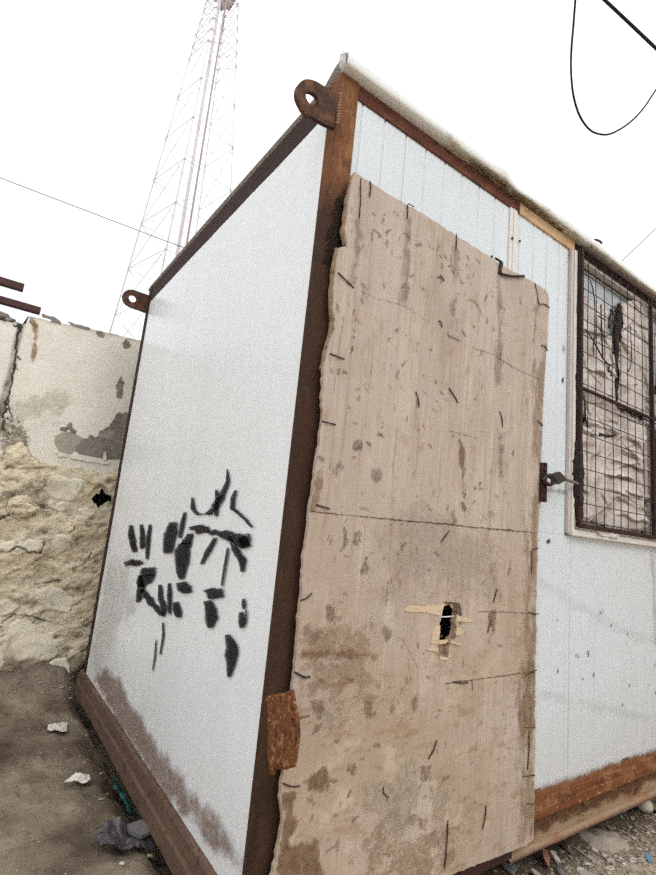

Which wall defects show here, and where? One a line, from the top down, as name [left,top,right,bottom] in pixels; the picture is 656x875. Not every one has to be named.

corrosion [30,318,39,359]
crack [1,320,34,433]
peeling [115,376,125,399]
flaking render [0,411,128,681]
corrosion [96,669,232,856]
corrosion [534,751,656,797]
corrosion [534,772,656,832]